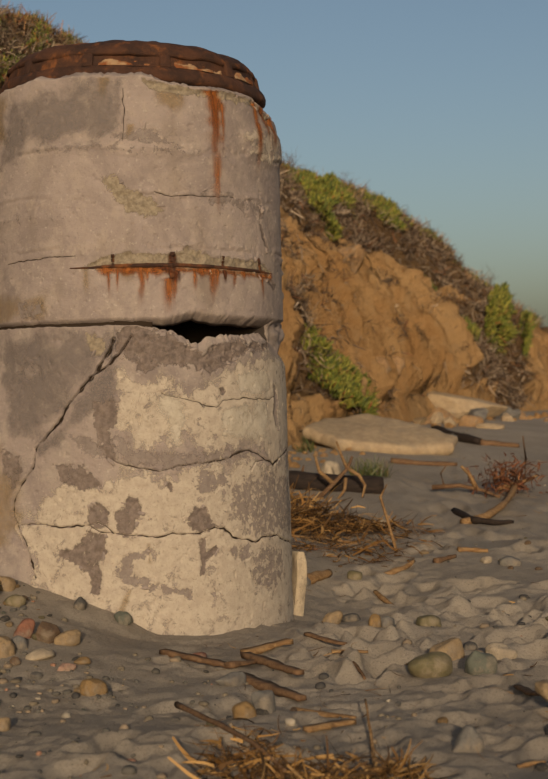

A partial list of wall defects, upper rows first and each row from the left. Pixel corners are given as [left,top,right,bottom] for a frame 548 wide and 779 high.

rust [204,90,224,148]
rust [251,103,277,151]
rust [70,252,272,300]
crack [0,321,289,578]
peeling [14,326,294,636]